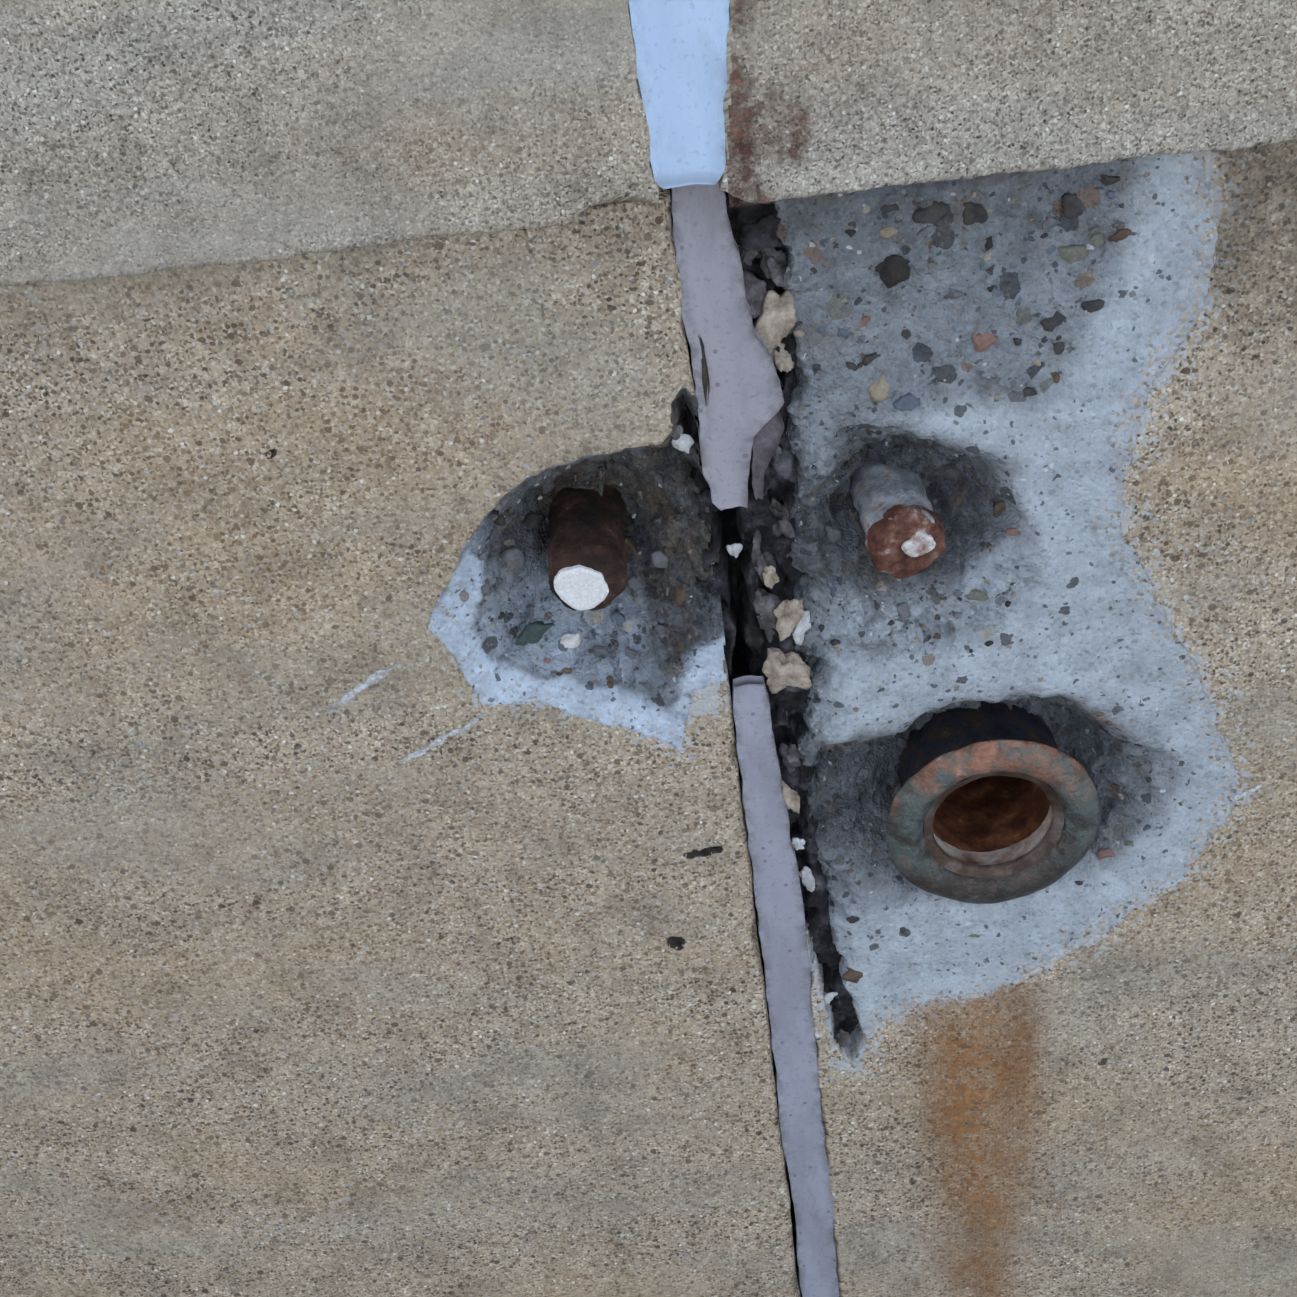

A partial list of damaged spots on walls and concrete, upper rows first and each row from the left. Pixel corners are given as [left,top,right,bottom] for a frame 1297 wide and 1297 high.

spalling [428,381,729,751]
crack [682,191,859,1047]
spalling [774,151,1262,1067]